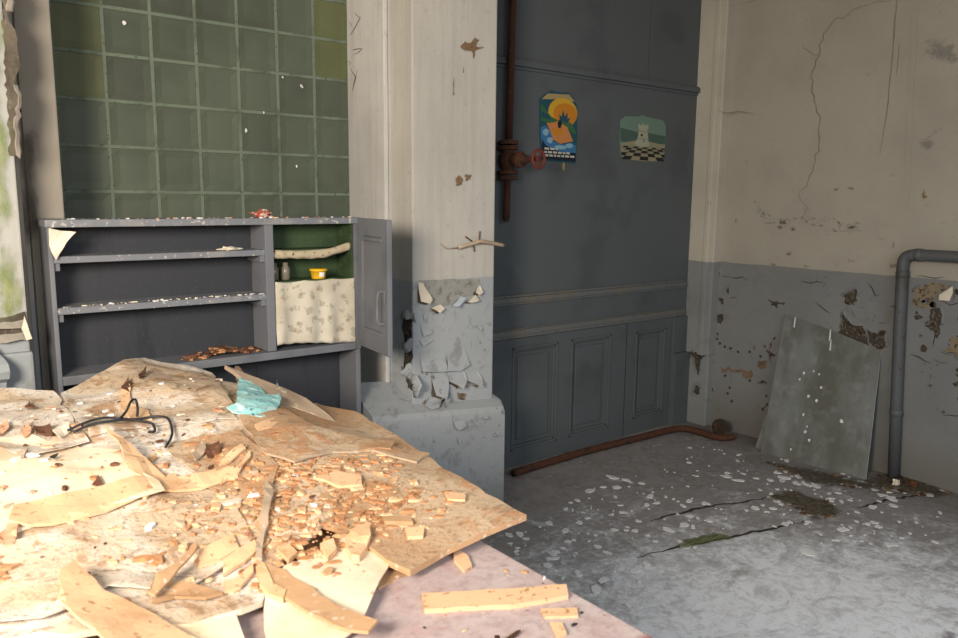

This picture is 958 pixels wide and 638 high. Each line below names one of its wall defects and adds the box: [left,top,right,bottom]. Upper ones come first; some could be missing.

crack [799,0,899,217]
peeling [400,310,483,409]
peeling [838,287,888,349]
peeling [912,282,958,386]
crack [651,497,765,521]
crack [637,520,804,558]
crack [858,493,936,508]